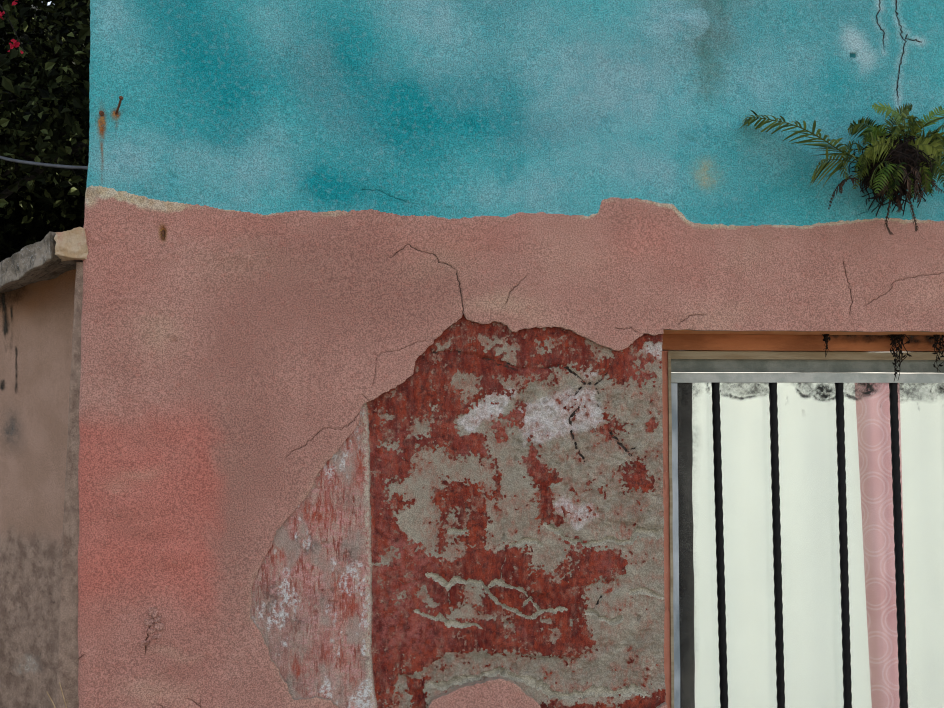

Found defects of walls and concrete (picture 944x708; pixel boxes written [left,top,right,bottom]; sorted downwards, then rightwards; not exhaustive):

crack [876,0,921,98]
rust [98,111,119,161]
crack [390,245,464,315]
crack [543,363,613,462]
flaking render [250,315,666,708]
crack [392,523,664,629]